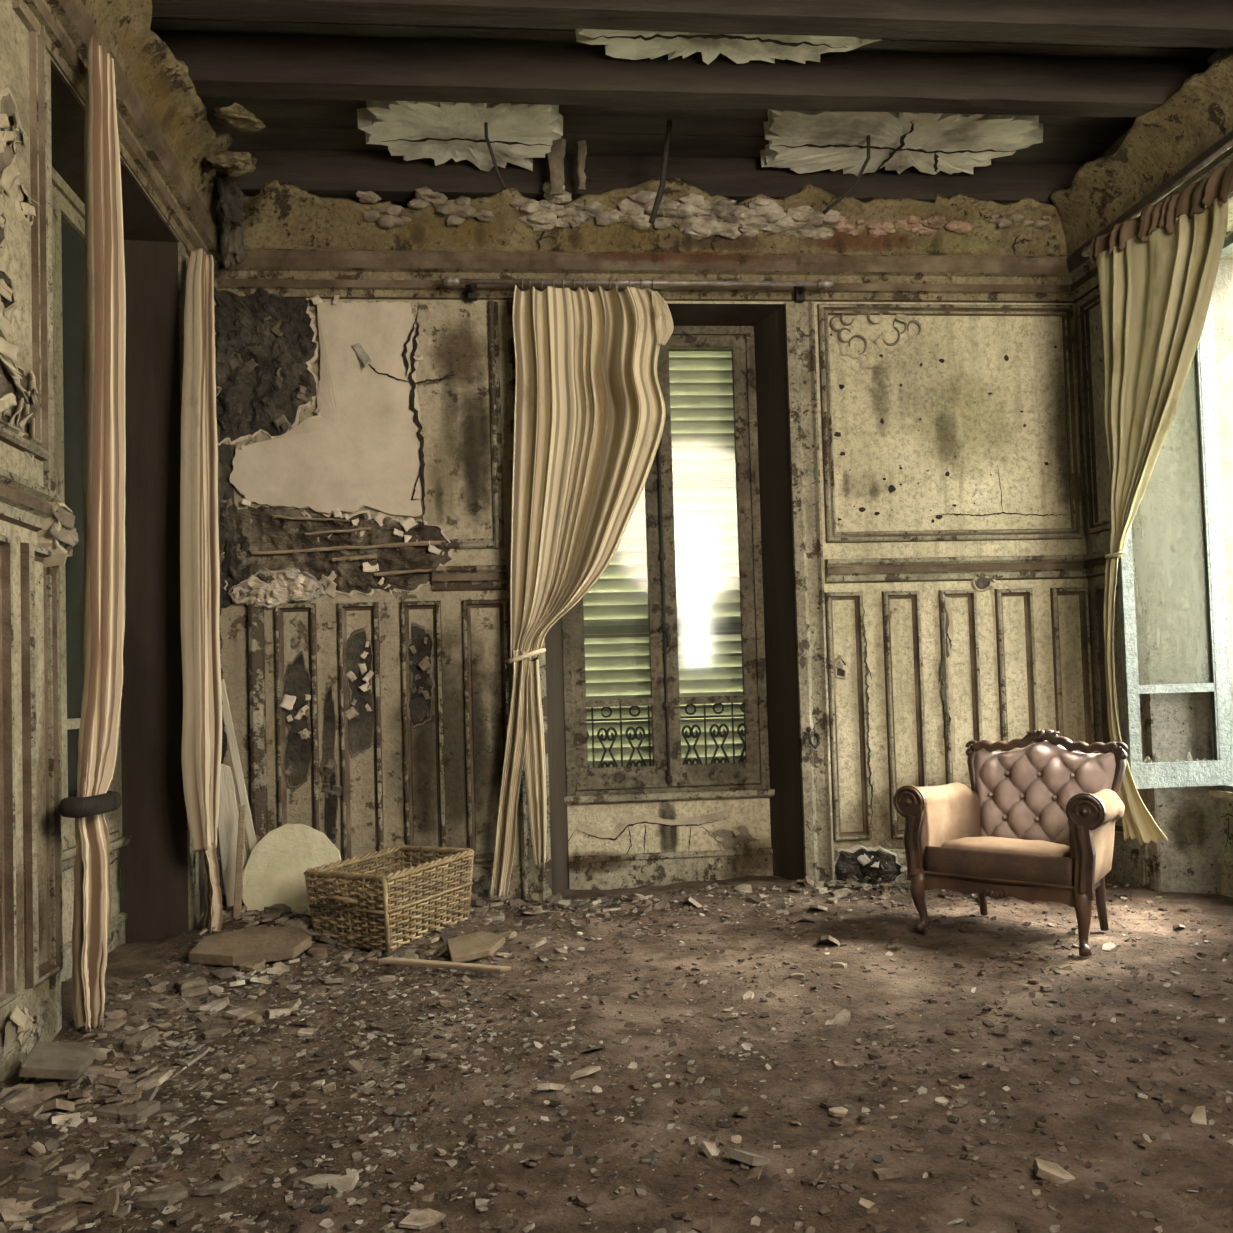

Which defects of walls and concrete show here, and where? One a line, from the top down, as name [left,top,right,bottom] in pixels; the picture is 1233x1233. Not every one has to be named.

flaking render [575,29,882,64]
flaking render [357,100,563,172]
flaking render [760,109,1043,176]
flaking render [356,187,495,229]
flaking render [510,181,1052,241]
peeling [0,88,40,464]
water stain [437,328,480,378]
flaking render [214,289,457,681]
crack [368,304,456,528]
water stain [457,396,489,499]
peeling [406,622,435,729]
peeling [280,627,375,844]